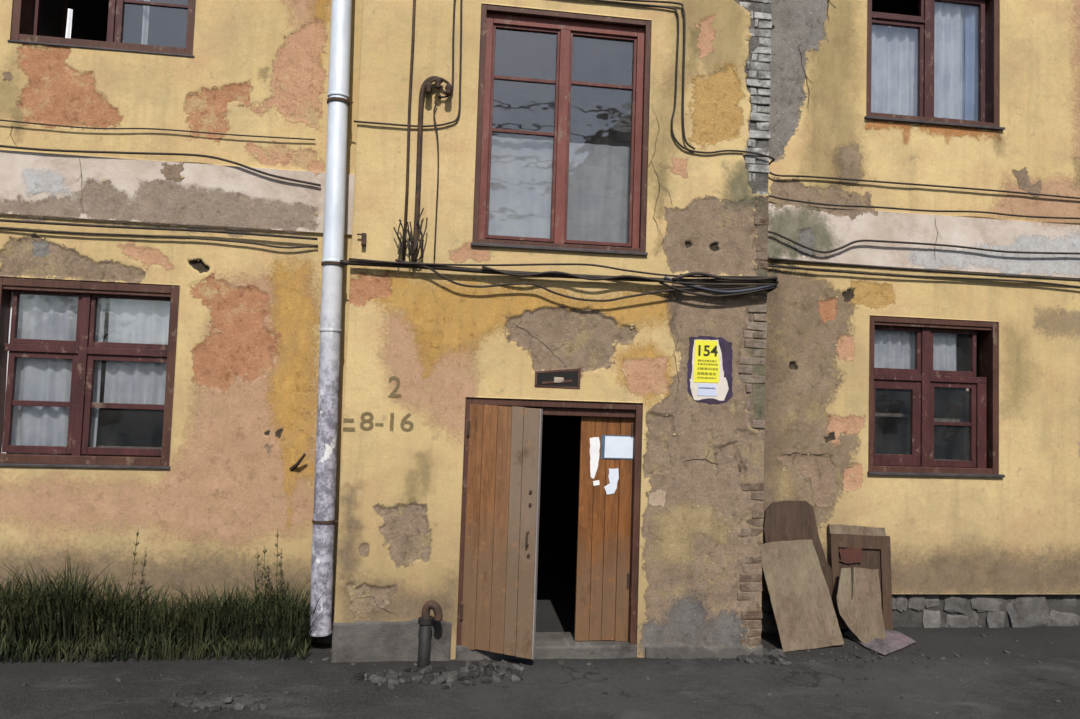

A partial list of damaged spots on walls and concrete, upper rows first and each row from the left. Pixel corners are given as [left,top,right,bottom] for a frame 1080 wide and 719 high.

peeling [2,43,123,130]
peeling [184,18,329,142]
peeling [0,162,319,283]
peeling [190,273,282,394]
flaking render [503,0,896,648]
flaking render [373,502,432,569]
spalling [345,582,397,618]